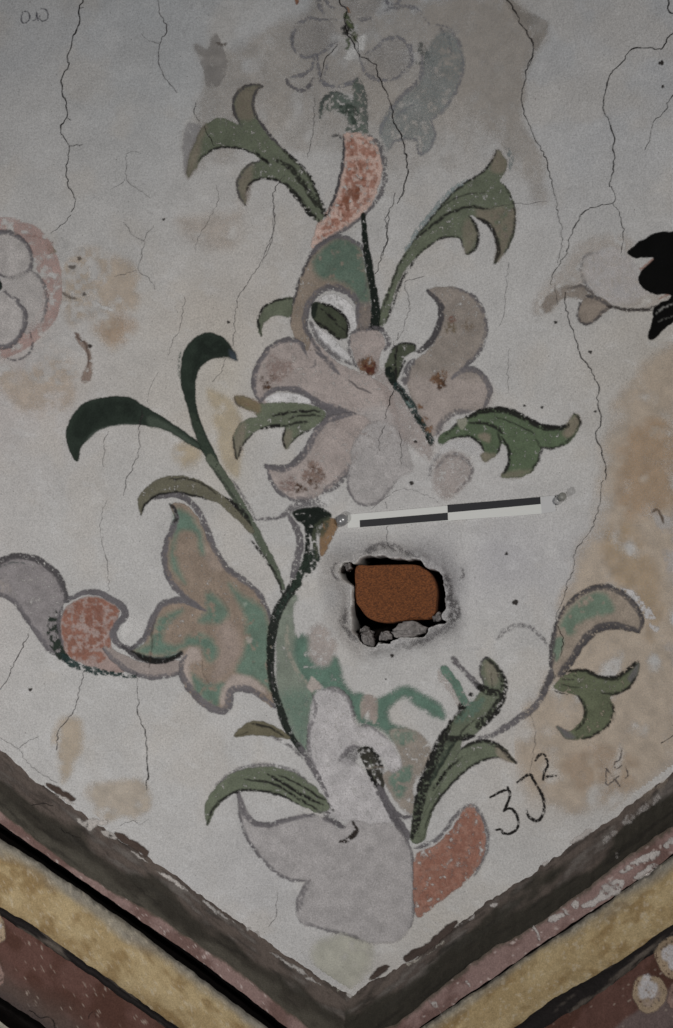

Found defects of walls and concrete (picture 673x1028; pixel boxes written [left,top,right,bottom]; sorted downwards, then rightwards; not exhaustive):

crack [55,0,84,231]
crack [320,0,409,274]
crack [507,0,673,653]
leakage [517,348,673,813]